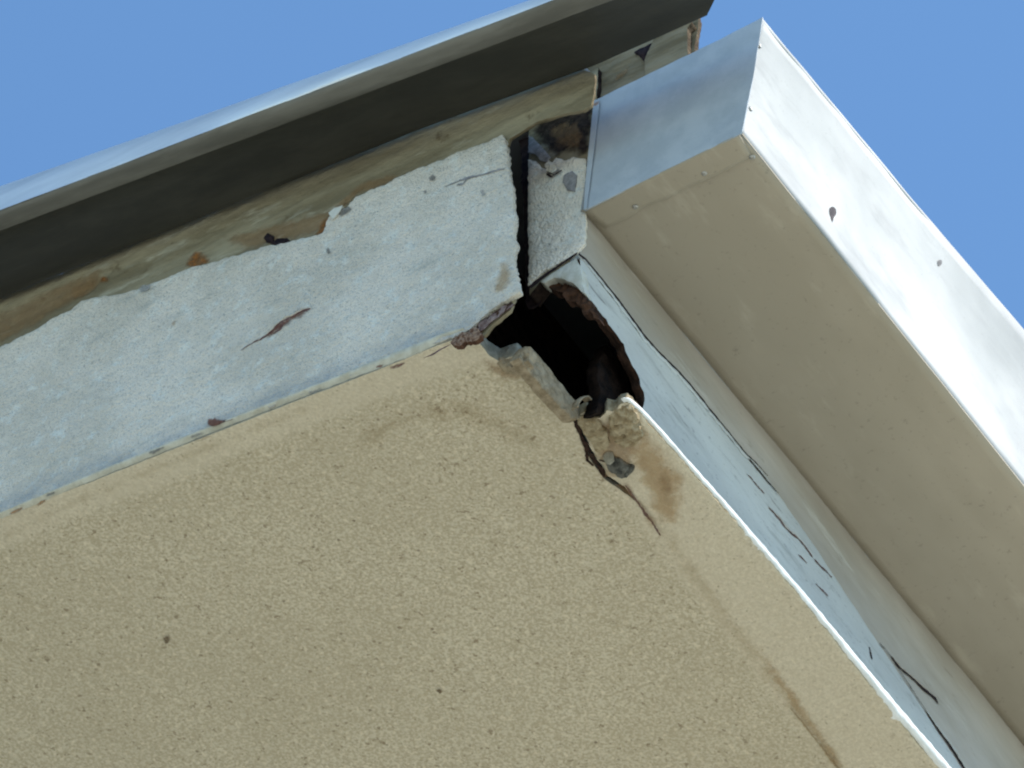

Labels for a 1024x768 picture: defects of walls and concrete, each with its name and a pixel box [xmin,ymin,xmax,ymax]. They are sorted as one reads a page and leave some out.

rust [187,253,208,267]
peeling [329,205,350,221]
spalling [497,347,644,479]
crack [447,137,832,596]
crack [790,708,839,768]
crack [869,643,966,768]